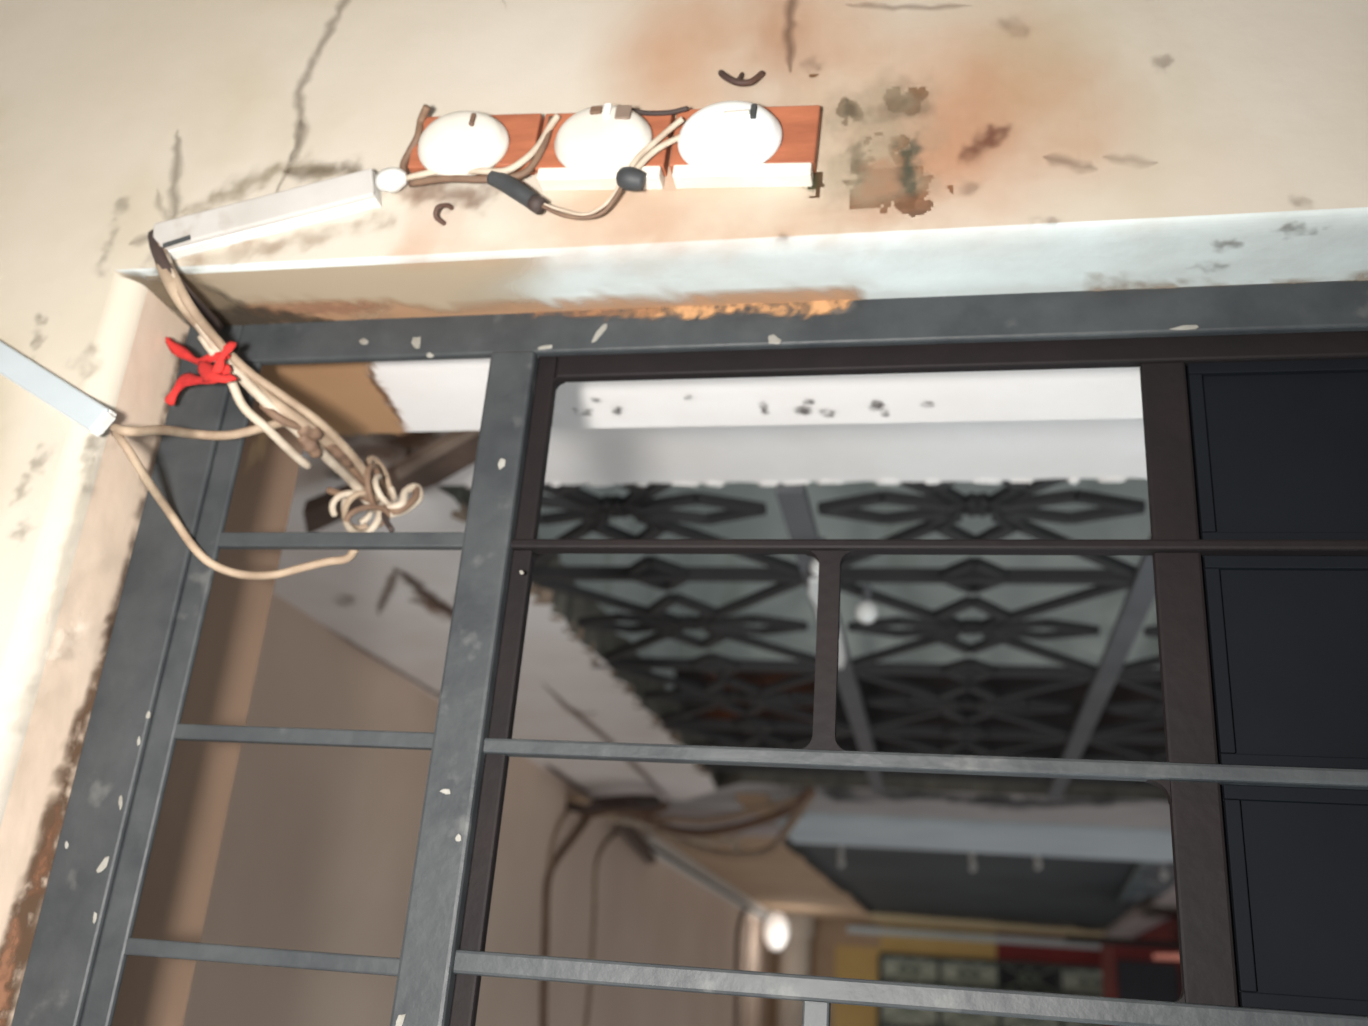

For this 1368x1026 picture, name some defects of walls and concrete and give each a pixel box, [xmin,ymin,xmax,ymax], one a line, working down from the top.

flaking render [239,289,860,343]
spalling [165,335,187,412]
peeling [260,362,406,436]
peeling [411,337,434,358]
spalling [797,400,834,417]
spalling [148,438,160,478]
spalling [0,538,135,1026]